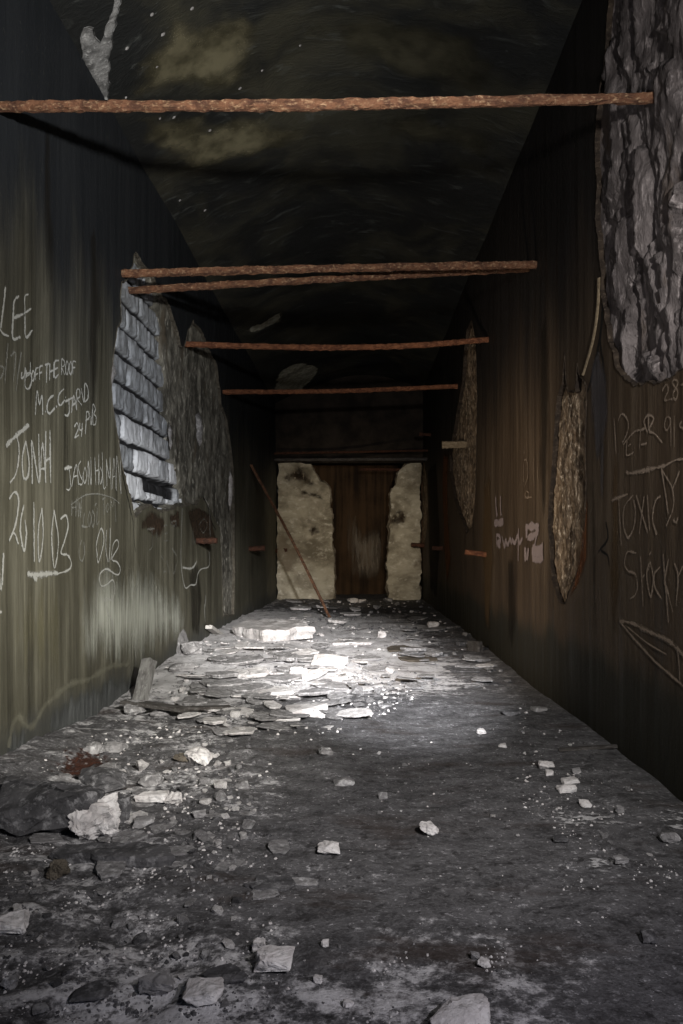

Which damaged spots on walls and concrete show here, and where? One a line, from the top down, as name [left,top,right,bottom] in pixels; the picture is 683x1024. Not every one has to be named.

spalling [80,0,129,100]
spalling [110,252,235,617]
spalling [449,320,477,534]
spalling [548,0,683,605]